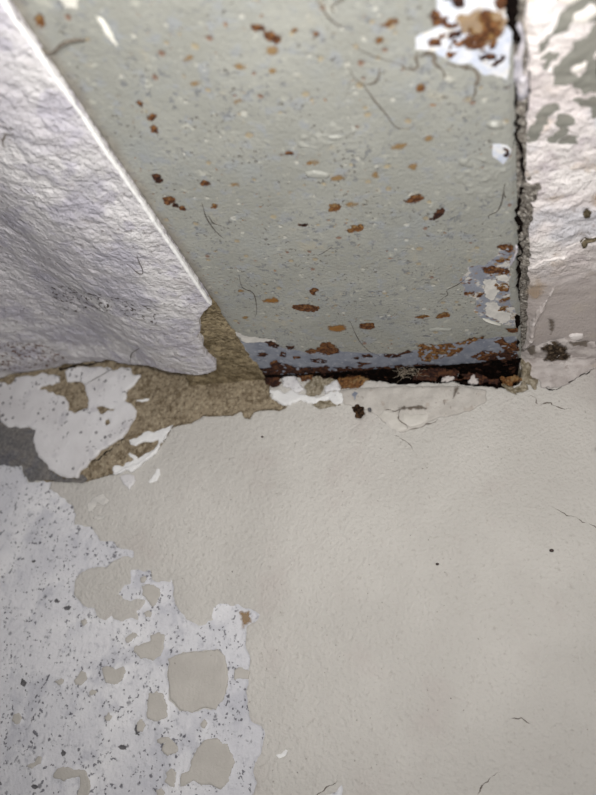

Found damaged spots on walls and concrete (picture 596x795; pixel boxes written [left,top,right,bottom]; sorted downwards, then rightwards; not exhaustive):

rust [250,24,281,55]
crack [504,0,531,349]
rust [162,196,186,211]
rust [404,194,424,203]
crack [580,237,596,249]
rust [260,328,520,389]
peeling [0,244,554,795]